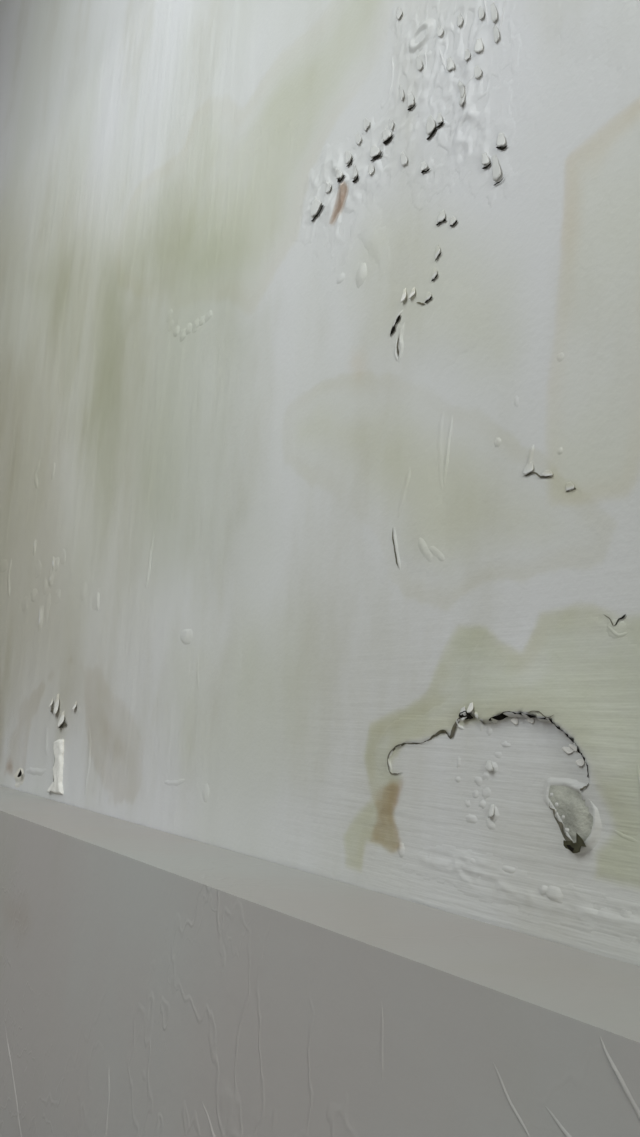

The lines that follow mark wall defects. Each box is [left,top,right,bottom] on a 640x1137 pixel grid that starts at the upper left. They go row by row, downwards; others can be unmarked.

peeling [293,0,521,281]
flaking render [544,777,602,855]